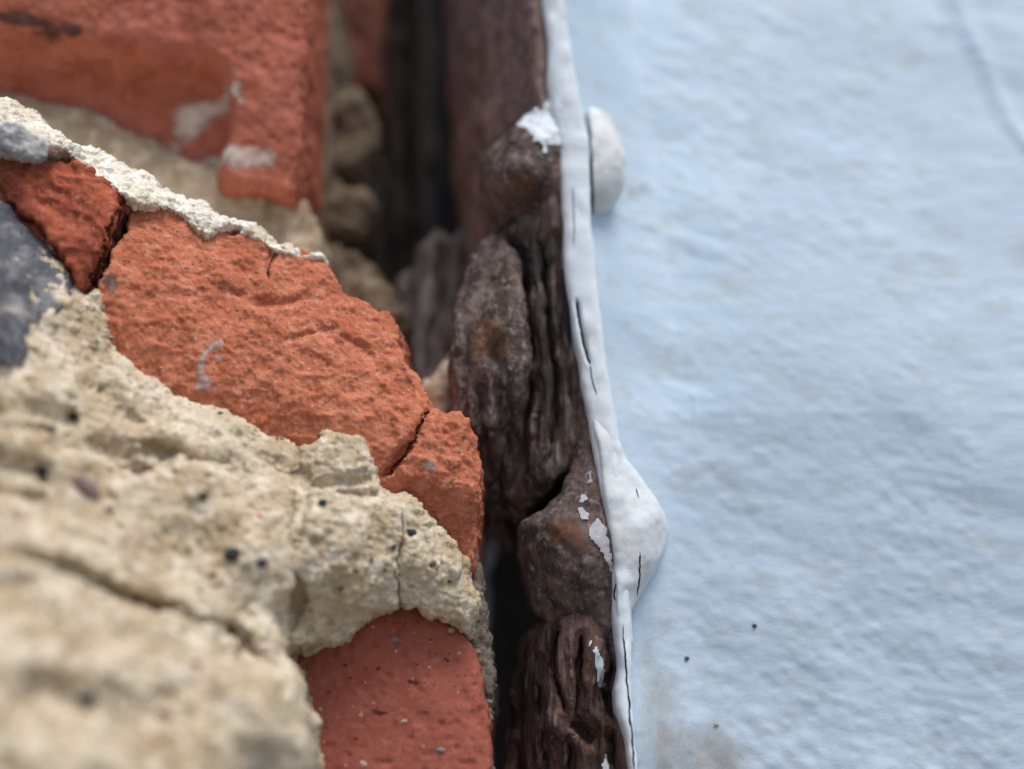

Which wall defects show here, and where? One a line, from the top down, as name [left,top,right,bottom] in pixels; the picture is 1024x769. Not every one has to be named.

crack [89,207,132,289]
crack [382,410,430,476]
peeling [578,470,613,572]